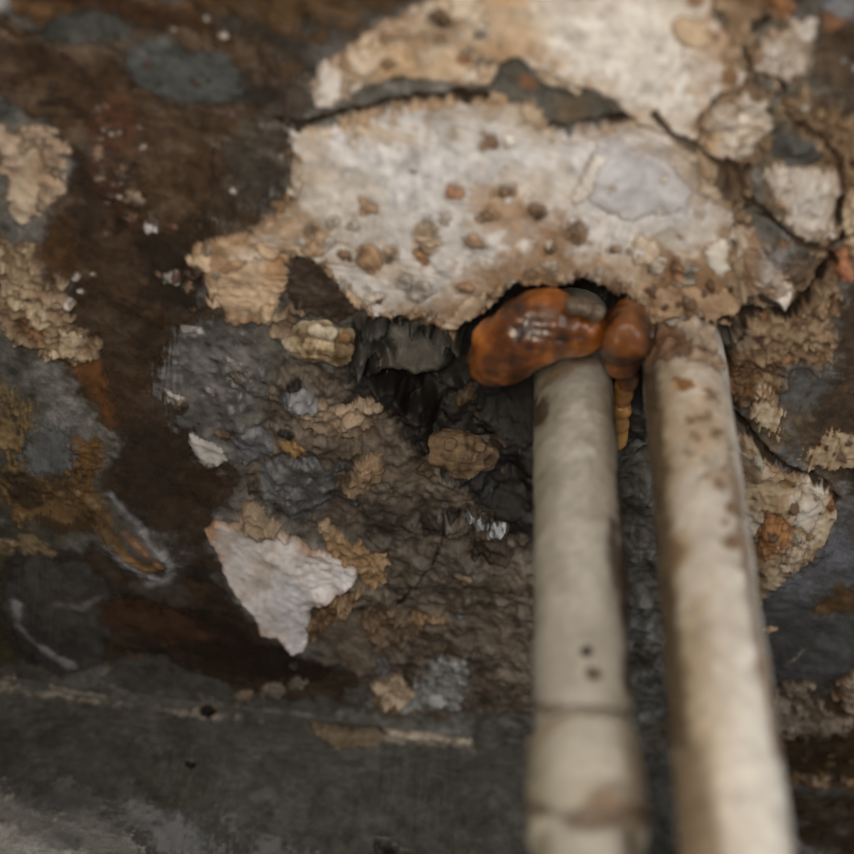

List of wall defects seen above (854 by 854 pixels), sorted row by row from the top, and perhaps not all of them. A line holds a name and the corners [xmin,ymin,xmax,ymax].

peeling [17,128,67,173]
crack [277,87,491,133]
crack [589,111,722,164]
water stain [144,216,157,233]
crack [717,46,854,346]
peeling [0,244,87,363]
water stain [63,273,94,311]
flaking render [185,0,854,719]
water stain [152,325,266,474]
water stain [283,388,318,417]
corrosion [609,460,632,694]
flaking render [773,670,854,741]